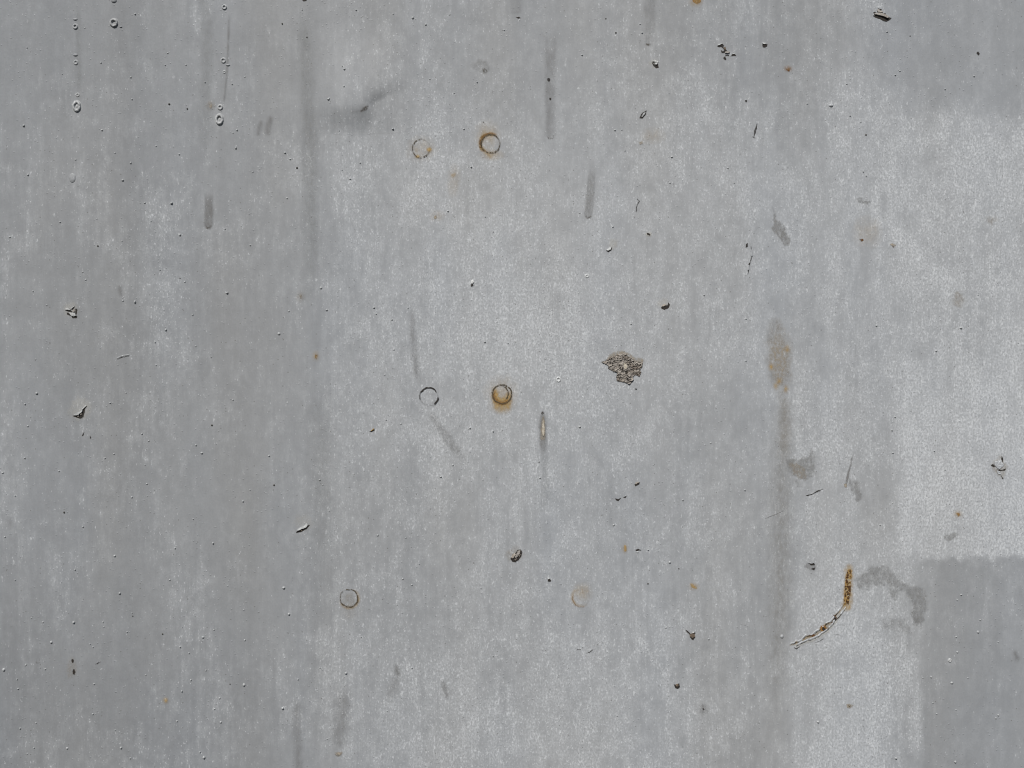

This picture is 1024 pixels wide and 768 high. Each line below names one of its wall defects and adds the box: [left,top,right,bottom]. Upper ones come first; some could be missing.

peeling [602,351,643,384]
corrosion [493,387,510,410]
corrosion [843,569,852,608]